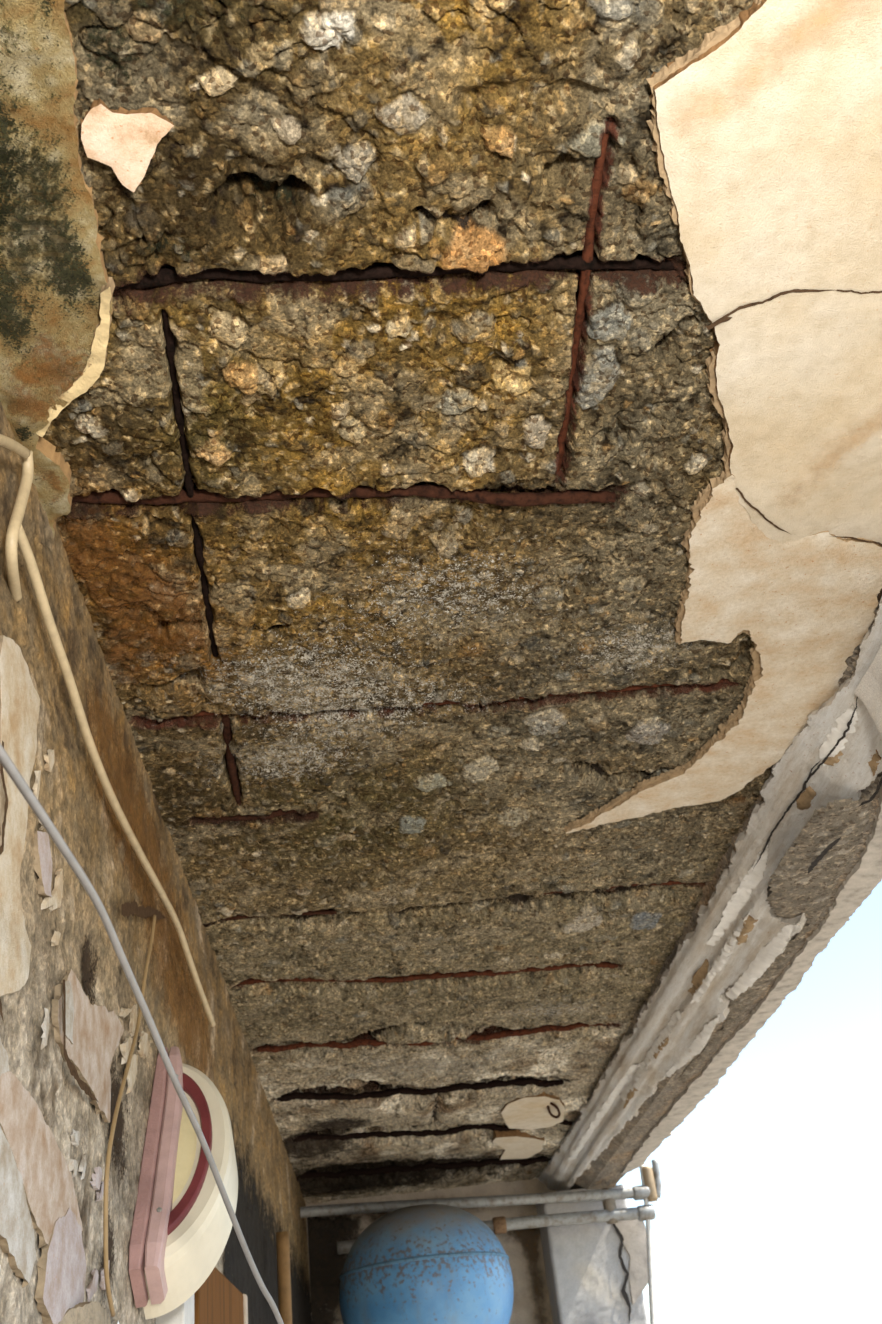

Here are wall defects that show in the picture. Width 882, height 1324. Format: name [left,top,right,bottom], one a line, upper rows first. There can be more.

peeling [0,635,63,996]
rust [8,334,86,424]
leakage [0,0,101,446]
leakage [75,0,143,92]
leakage [244,172,306,213]
rust [42,117,689,684]
spalling [36,0,771,1141]
rust [86,678,740,1079]
peeling [564,471,882,833]
crack [735,488,790,534]
crack [706,289,882,330]
crack [612,1224,631,1324]